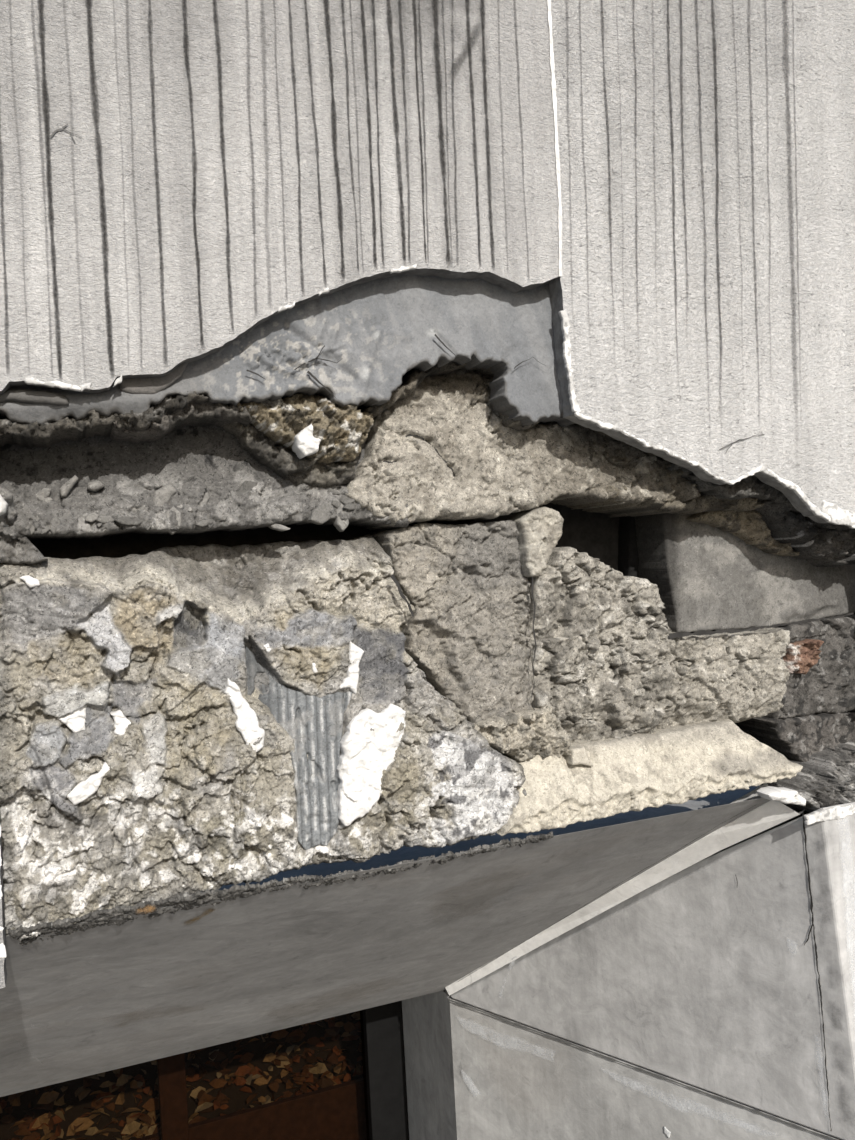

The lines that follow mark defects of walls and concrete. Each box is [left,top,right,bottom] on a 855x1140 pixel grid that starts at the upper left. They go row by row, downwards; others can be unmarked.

crack [50,124,81,143]
spalling [0,264,855,958]
crack [448,804,837,1140]